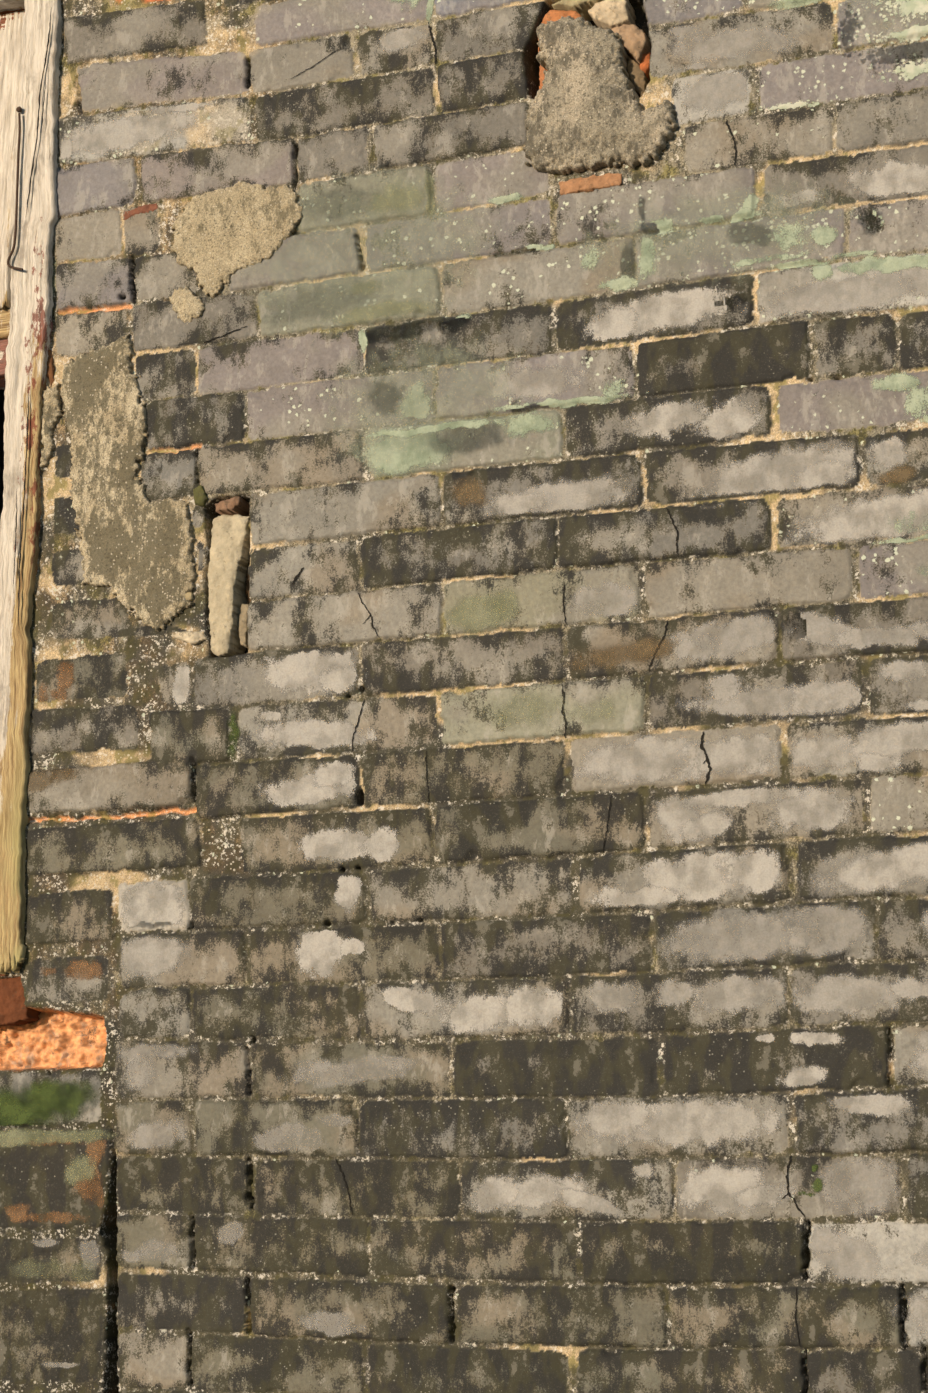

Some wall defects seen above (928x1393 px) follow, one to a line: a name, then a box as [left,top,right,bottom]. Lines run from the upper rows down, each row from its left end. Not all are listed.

spalling [538,0,651,98]
flaking render [39,333,251,657]
crack [359,595,380,638]
crack [352,699,365,751]
crack [700,732,712,785]
crack [782,1155,805,1217]